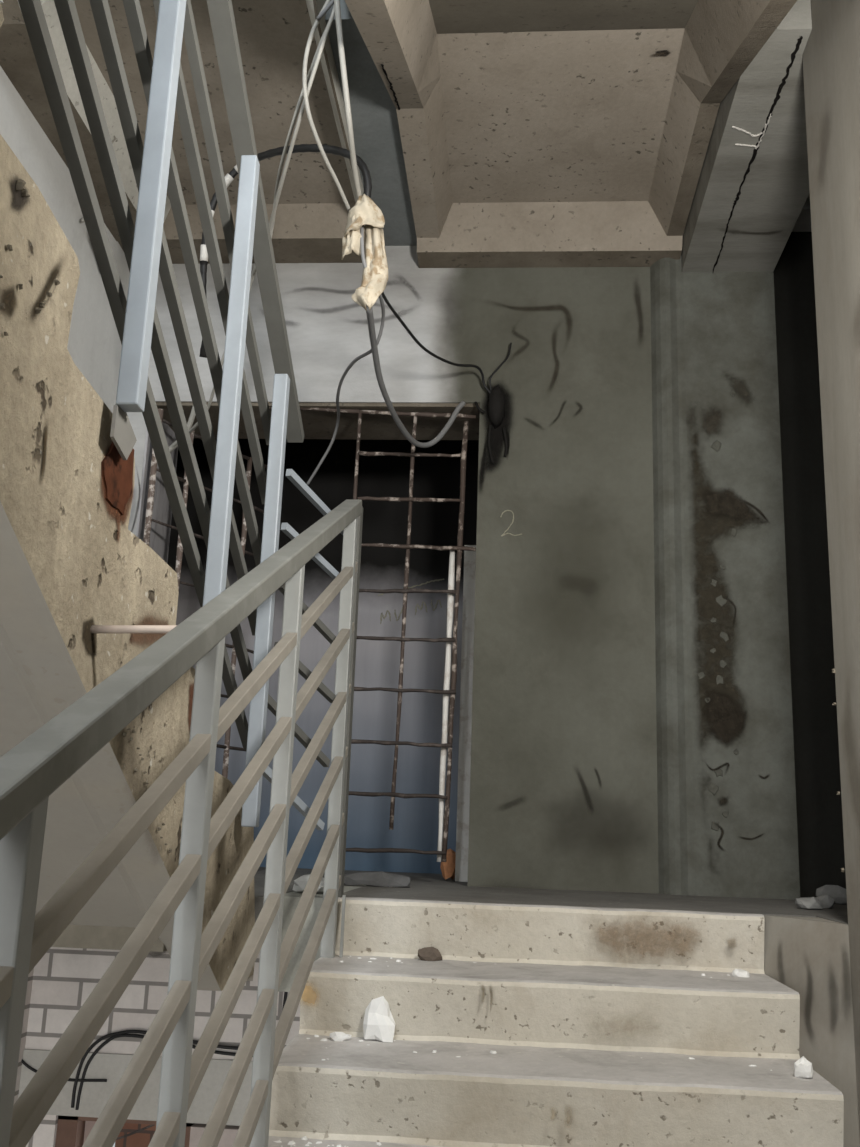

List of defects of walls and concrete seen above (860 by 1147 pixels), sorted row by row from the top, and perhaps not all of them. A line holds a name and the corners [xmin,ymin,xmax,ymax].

crack [713,36,803,272]
corrosion [102,449,133,540]
flaking render [688,409,767,849]